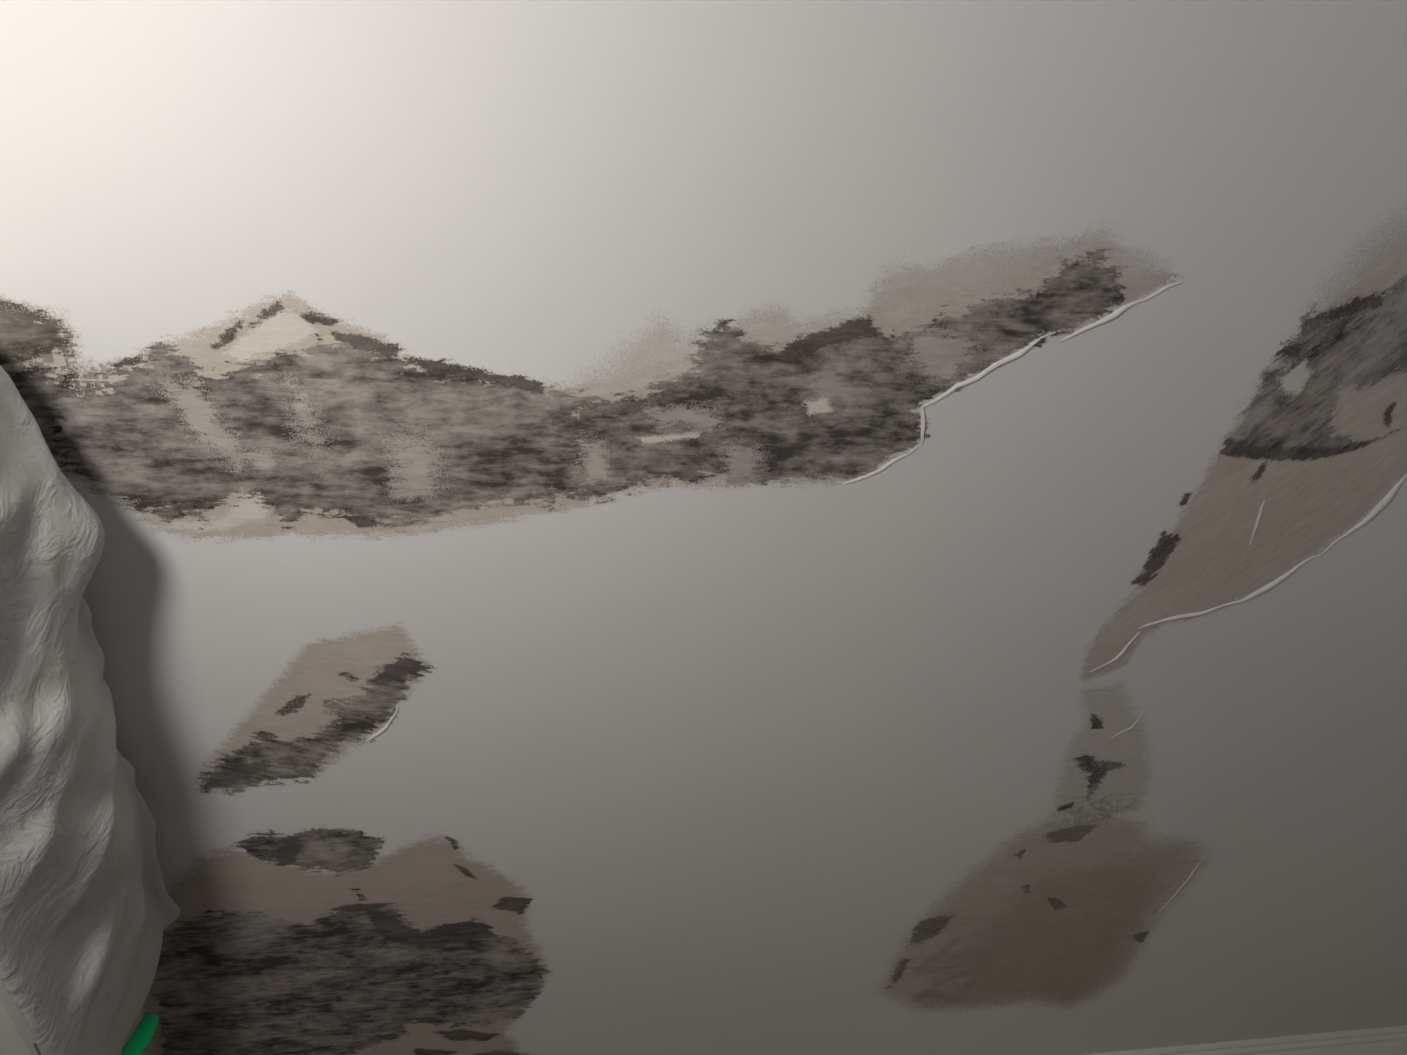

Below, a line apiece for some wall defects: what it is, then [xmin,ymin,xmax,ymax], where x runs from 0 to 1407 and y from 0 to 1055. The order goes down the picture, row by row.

peeling [0,218,1185,544]
peeling [1079,202,1407,683]
peeling [194,621,436,797]
peeling [136,824,554,1055]